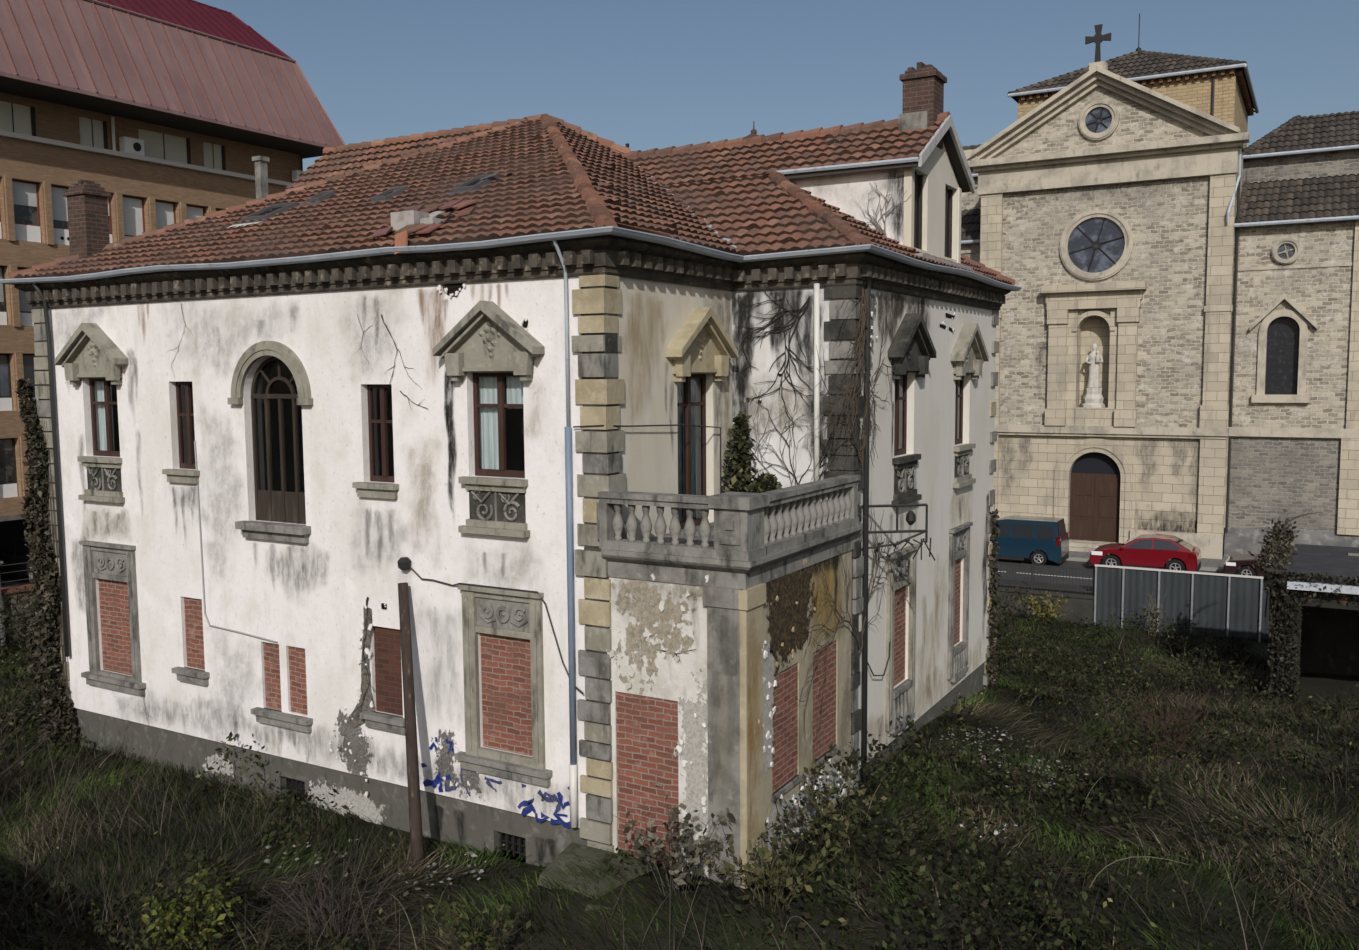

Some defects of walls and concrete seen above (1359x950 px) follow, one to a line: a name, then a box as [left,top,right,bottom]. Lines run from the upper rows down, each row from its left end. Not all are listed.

damp [445,373,456,498]
peeling [308,603,387,824]
peeling [606,574,709,695]
peeling [673,669,708,841]
flaking render [758,559,818,773]